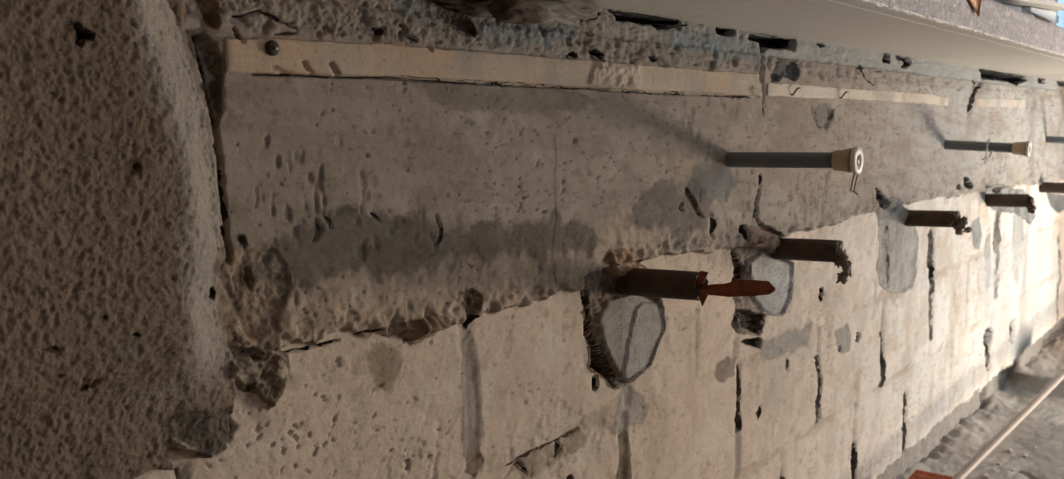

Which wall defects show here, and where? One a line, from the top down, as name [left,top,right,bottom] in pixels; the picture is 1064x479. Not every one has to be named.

crack [231,10,295,40]
spalling [424,0,477,37]
crack [253,52,764,115]
crack [214,152,228,252]
peeling [209,234,294,354]
crack [284,329,382,353]
spalling [462,288,485,330]
spalling [580,265,666,390]
crack [679,189,717,234]
spalling [730,219,794,349]
crack [883,226,891,284]
spalling [875,188,919,293]